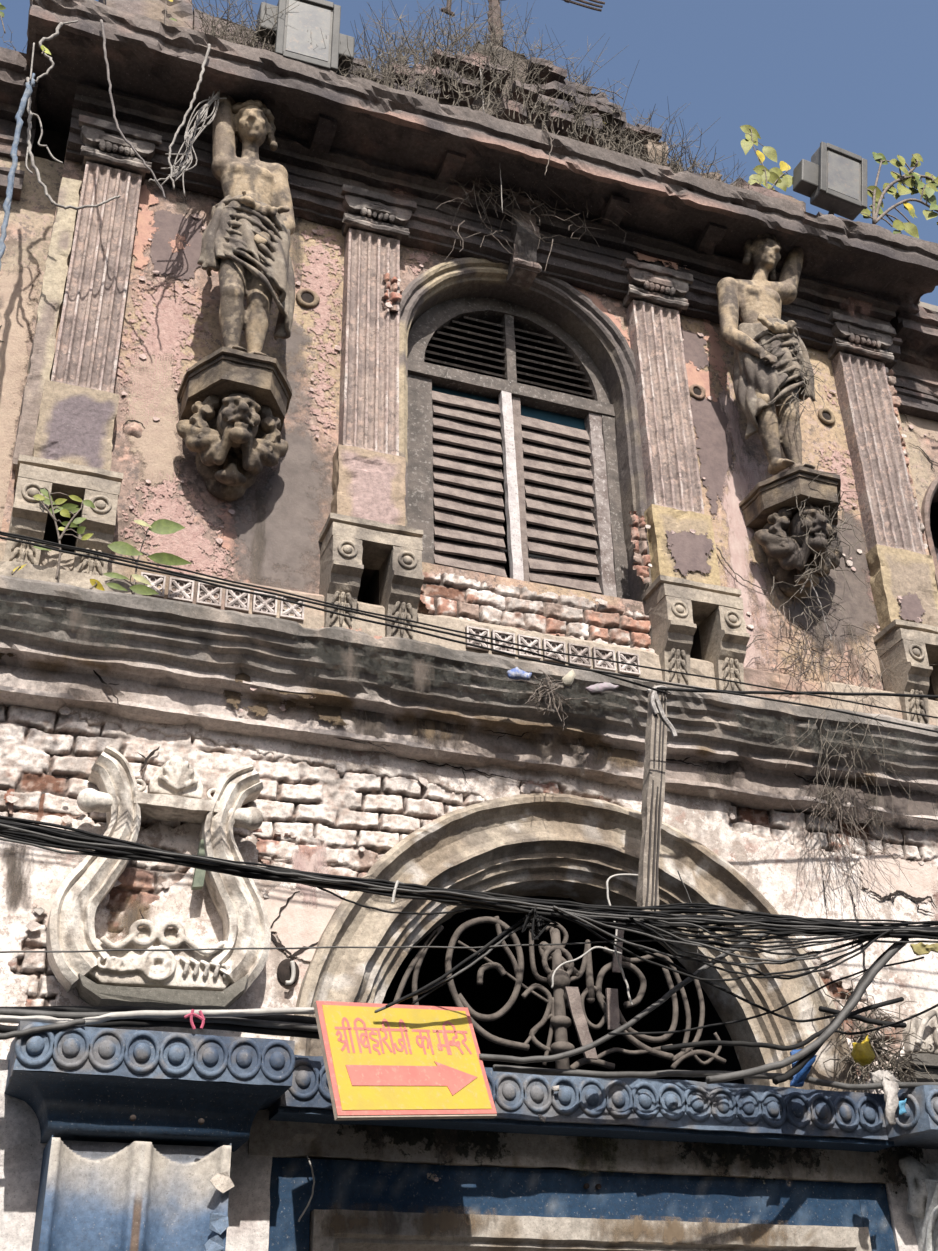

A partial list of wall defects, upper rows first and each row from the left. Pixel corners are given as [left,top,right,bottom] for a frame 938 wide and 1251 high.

peeling [116,184,240,581]
peeling [681,319,735,518]
peeling [628,511,714,584]
spalling [420,571,655,653]
peeling [897,592,927,623]
crack [93,670,120,706]
damp [414,663,430,686]
spalling [0,705,484,961]
spalling [728,805,938,903]
crack [822,866,937,1003]
damp [677,1141,829,1184]
damp [874,1146,928,1194]